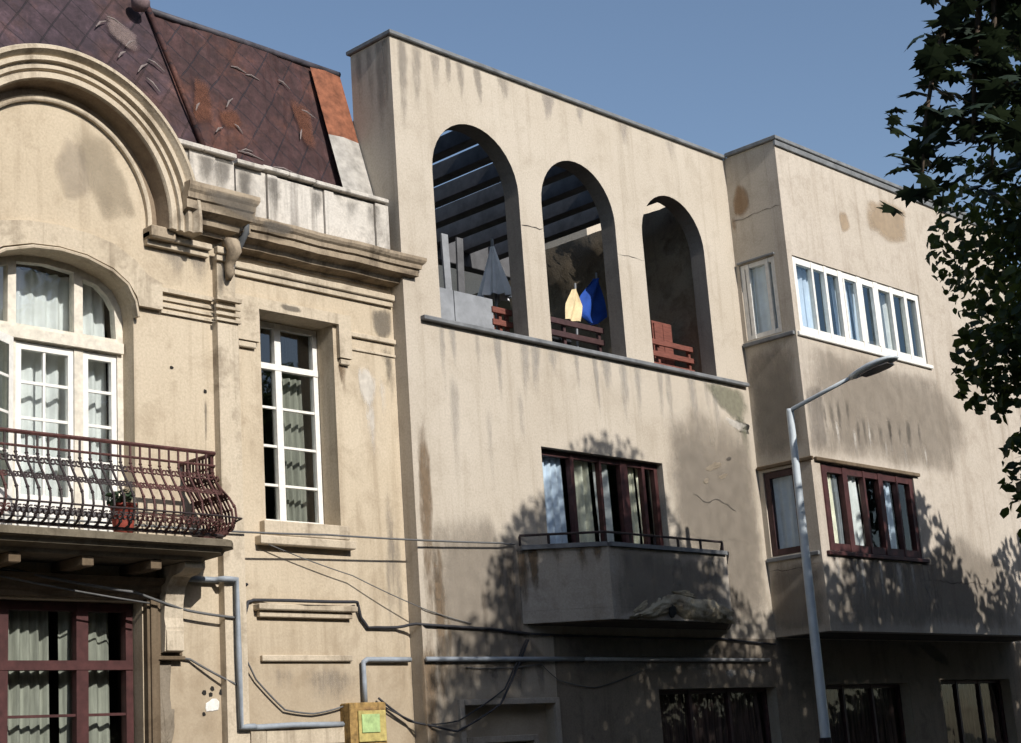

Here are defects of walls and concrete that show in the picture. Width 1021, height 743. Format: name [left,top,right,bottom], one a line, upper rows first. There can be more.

leakage [419,442,451,743]
leakage [514,550,538,593]